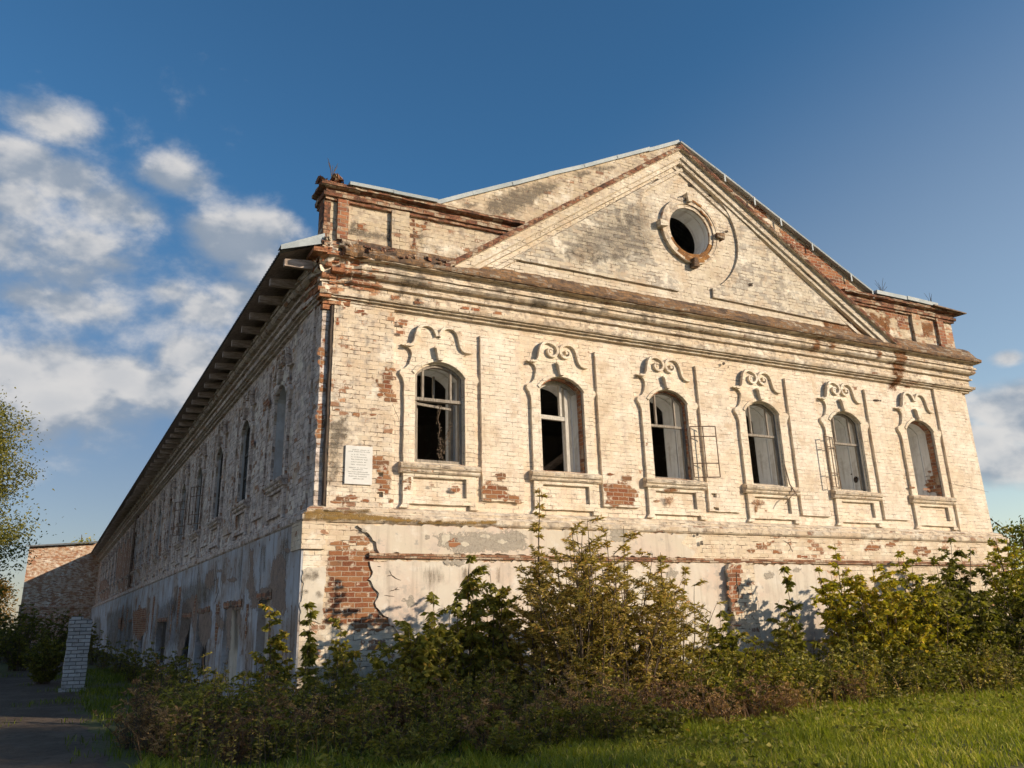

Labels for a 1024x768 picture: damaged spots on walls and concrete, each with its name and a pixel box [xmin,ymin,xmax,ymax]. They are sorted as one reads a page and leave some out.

spalling [780,229,864,292]
peeling [353,367,398,417]
peeling [330,495,369,504]
peeling [372,454,411,503]
peeling [481,473,521,504]
peeling [603,473,639,508]
peeling [426,529,528,568]
peeling [118,569,237,657]
peeling [260,548,290,615]
spalling [322,528,394,632]
spalling [726,564,753,627]